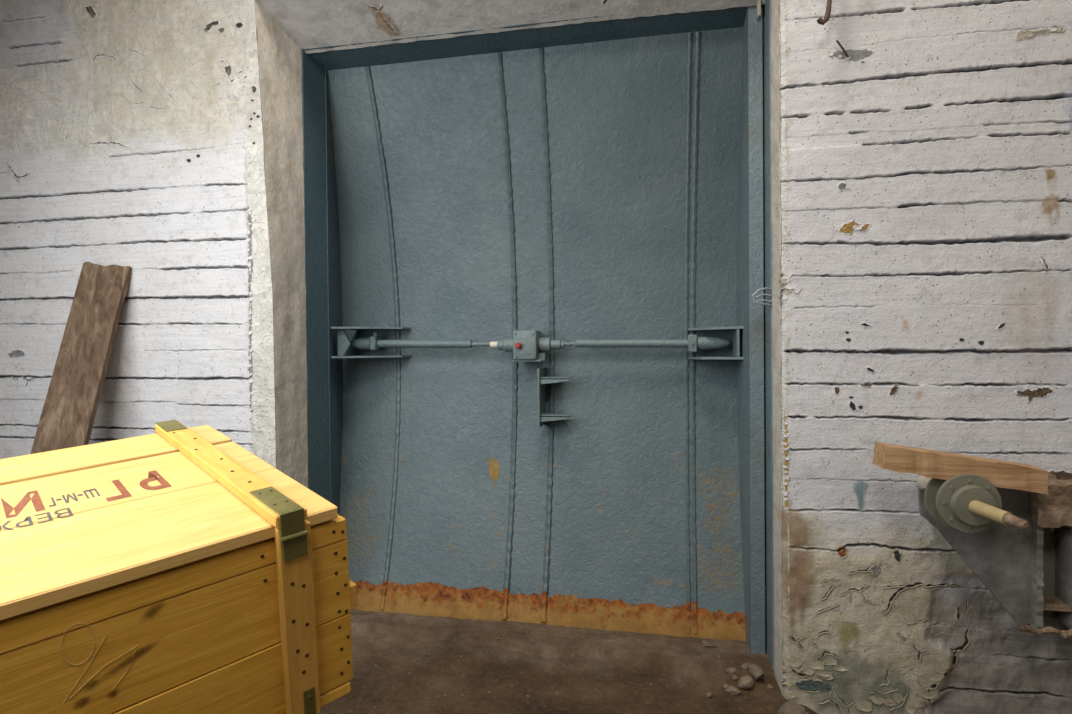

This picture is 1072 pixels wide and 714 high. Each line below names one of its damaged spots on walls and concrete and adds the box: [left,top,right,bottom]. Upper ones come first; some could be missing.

spalling [838,219,871,236]
spalling [1014,382,1057,404]
rust [489,460,499,479]
spalling [835,544,849,559]
spalling [870,547,903,576]
rust [351,580,746,641]
crack [787,565,971,714]
peeling [781,654,846,702]
peeling [857,659,954,714]